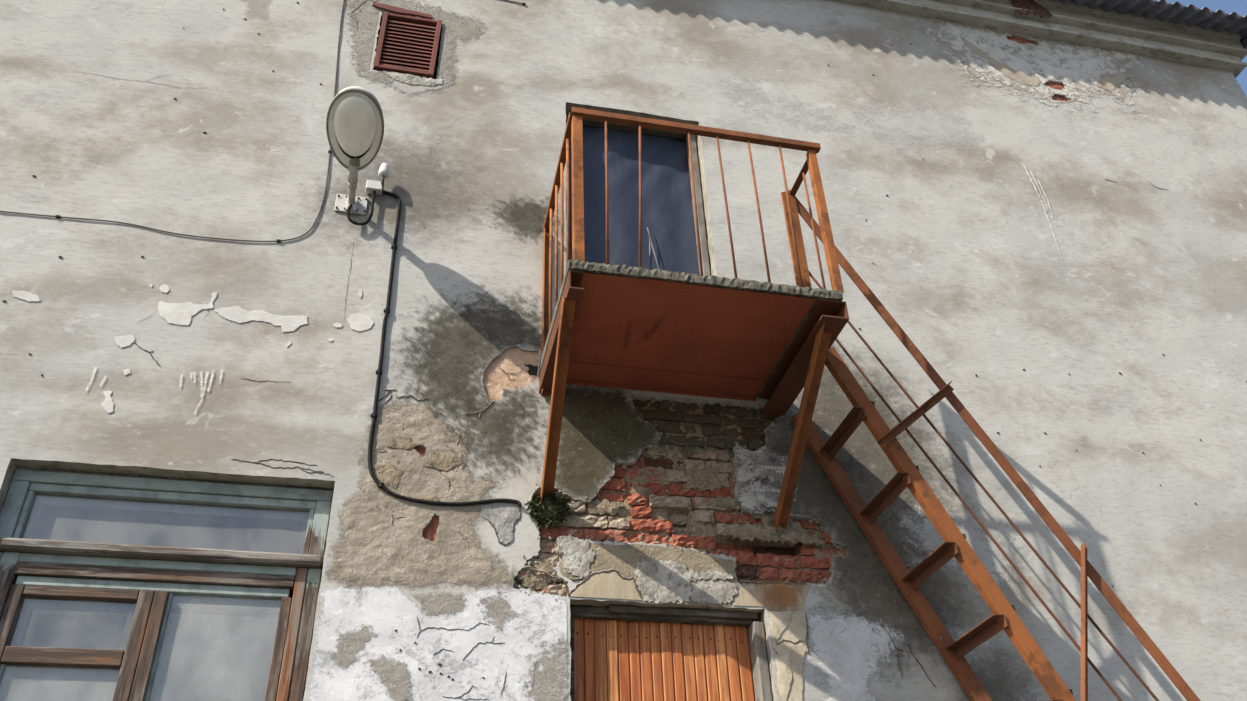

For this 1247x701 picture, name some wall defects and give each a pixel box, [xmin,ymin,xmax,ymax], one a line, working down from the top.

spalling [1012,0,1053,18]
peeling [907,15,1161,122]
peeling [114,335,135,348]
peeling [150,283,308,347]
peeling [328,289,374,341]
spalling [482,347,539,401]
spalling [308,393,904,701]
crack [417,618,536,700]